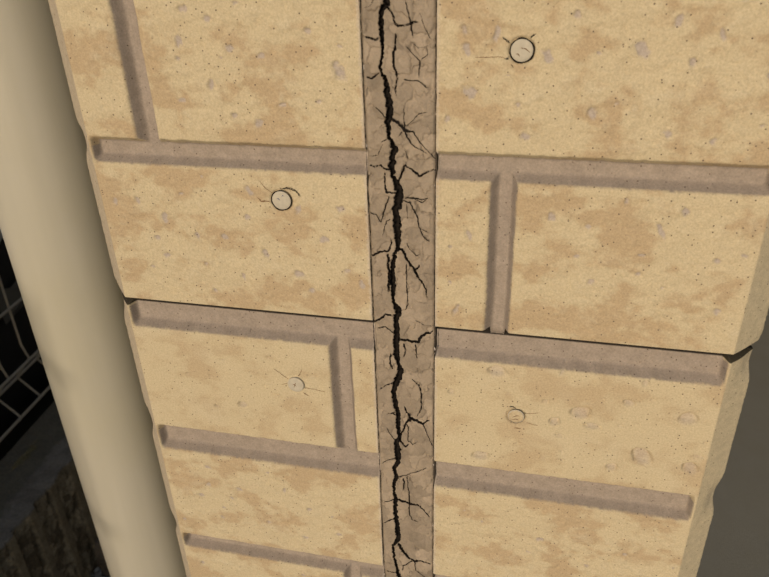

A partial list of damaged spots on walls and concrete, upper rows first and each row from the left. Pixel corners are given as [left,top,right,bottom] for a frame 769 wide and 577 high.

crack [359,0,438,577]